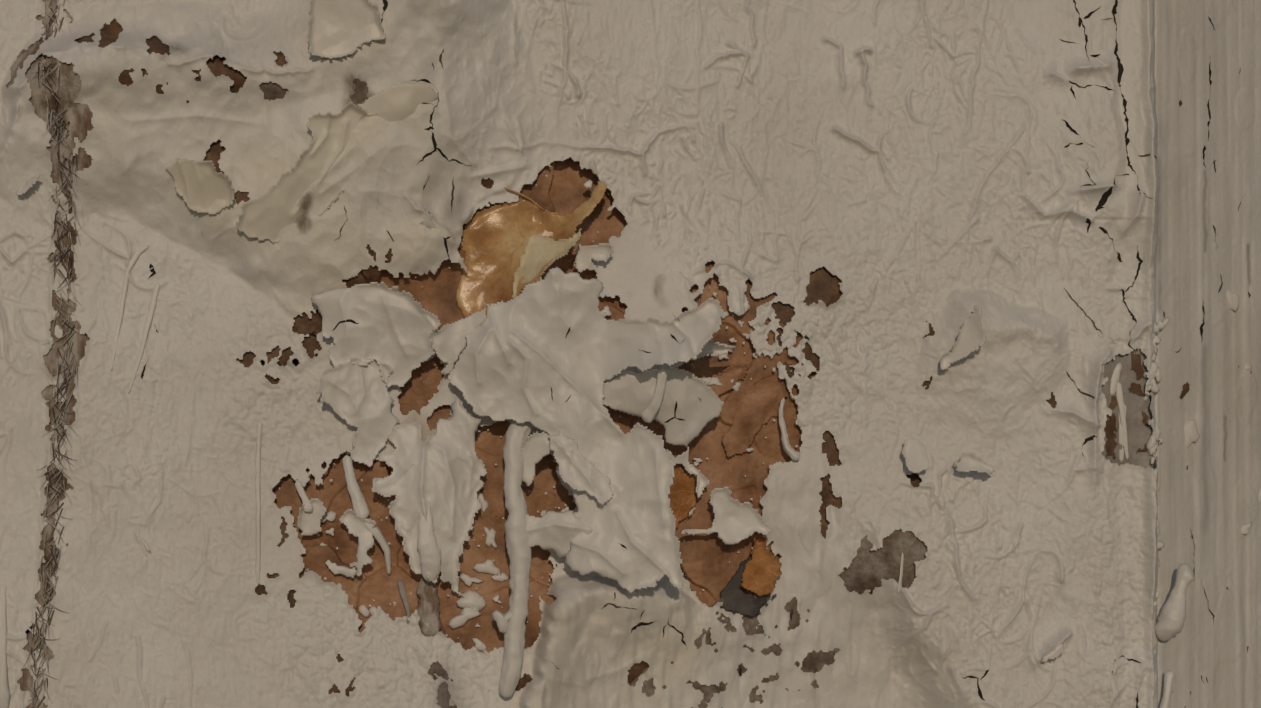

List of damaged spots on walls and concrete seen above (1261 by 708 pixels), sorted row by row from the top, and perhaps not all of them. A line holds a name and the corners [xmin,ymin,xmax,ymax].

peeling [74,18,123,48]
peeling [119,36,171,94]
peeling [192,55,289,101]
peeling [273,51,288,67]
peeling [307,0,386,59]
peeling [203,140,226,174]
crack [412,49,471,259]
crack [1060,0,1244,353]
crack [6,0,94,708]
peeling [234,157,843,708]
peeling [1101,349,1155,468]
peeling [838,529,928,594]